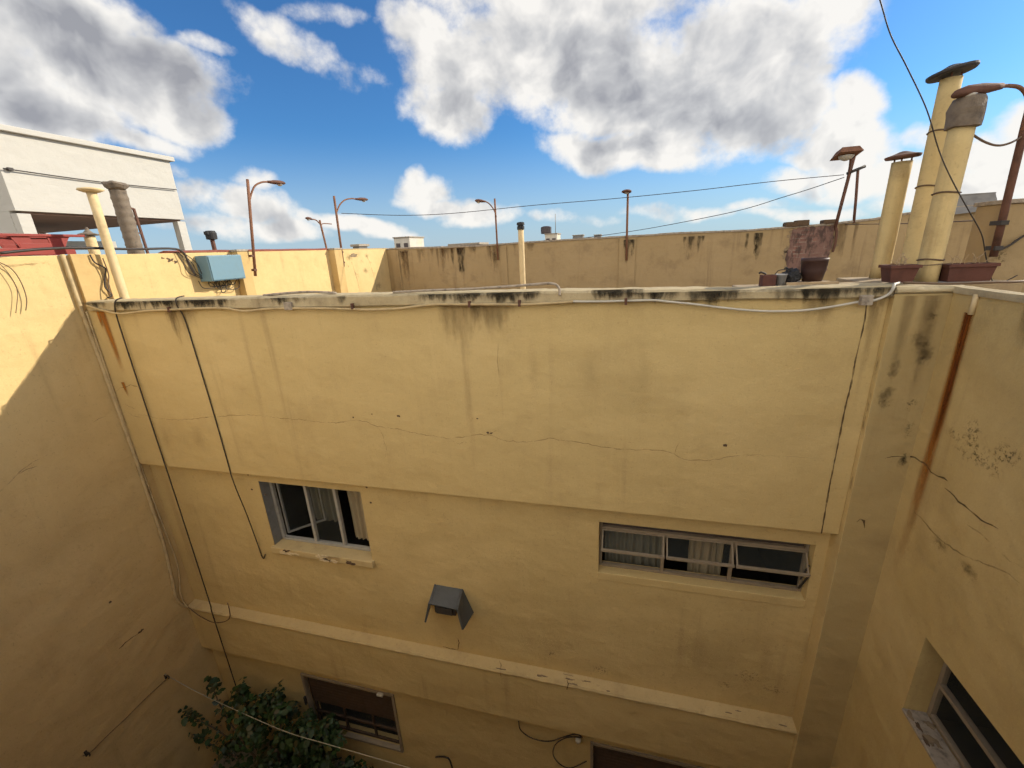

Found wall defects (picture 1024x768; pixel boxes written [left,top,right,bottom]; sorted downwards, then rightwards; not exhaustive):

water stain [116,299,226,307]
water stain [423,291,538,300]
water stain [593,289,676,298]
water stain [690,290,737,301]
rust [96,311,118,356]
crack [821,305,867,534]
rust [919,312,972,493]
crack [887,456,998,529]